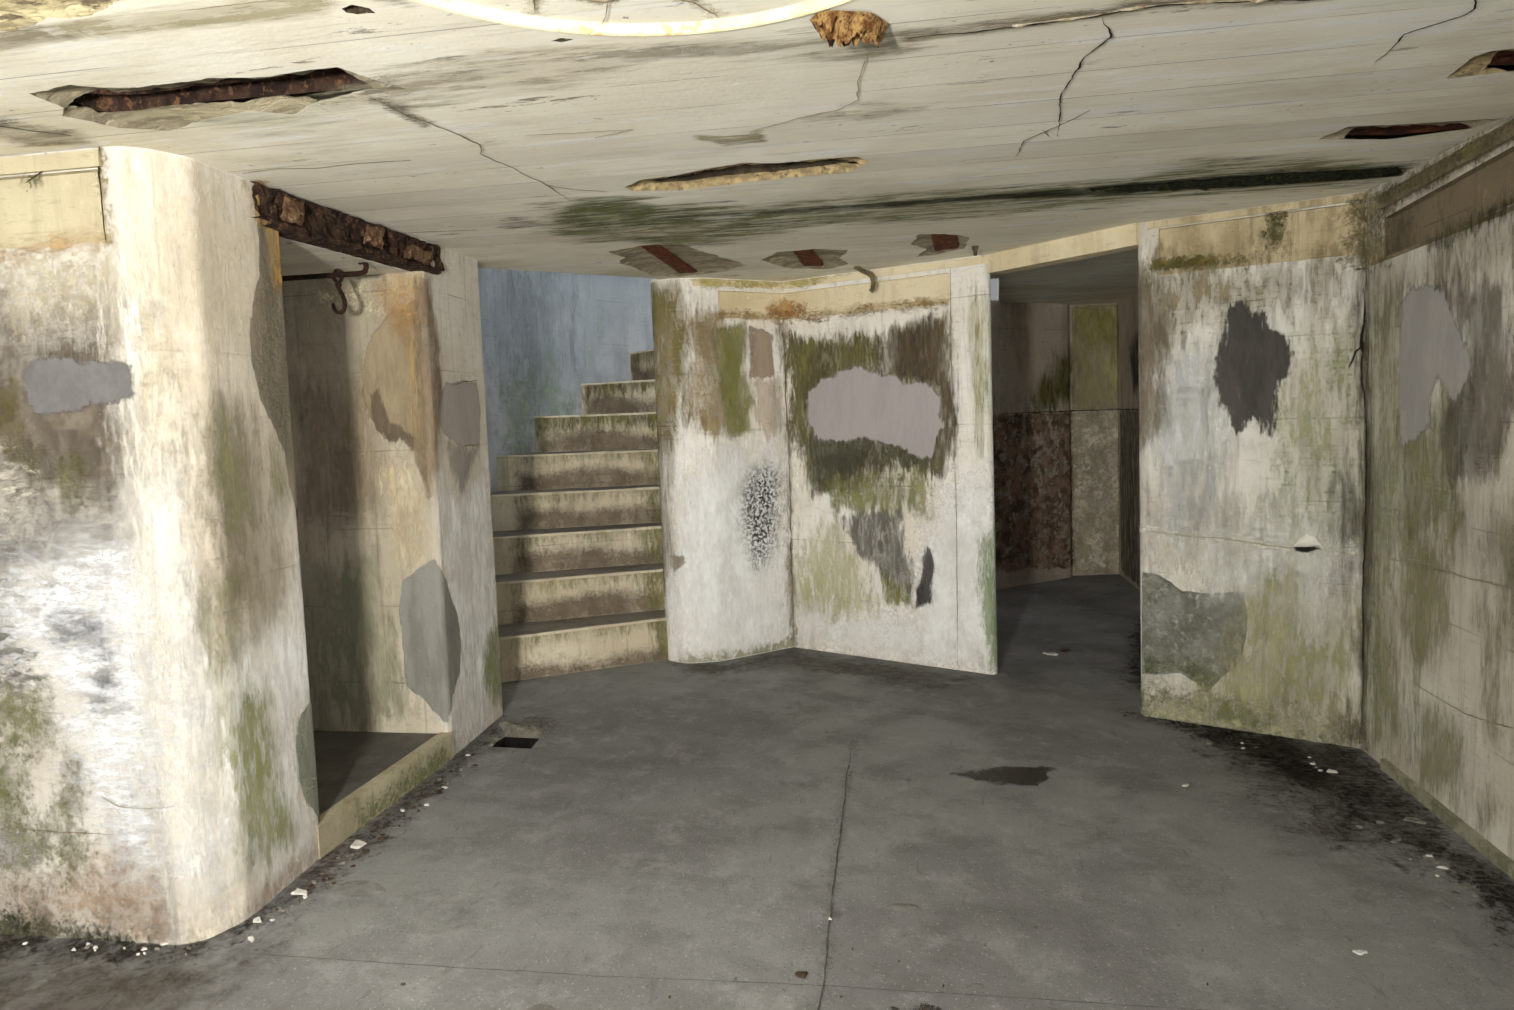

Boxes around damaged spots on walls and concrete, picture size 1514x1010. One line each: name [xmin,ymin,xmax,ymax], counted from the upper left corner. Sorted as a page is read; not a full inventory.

spalling [29,67,404,131]
crack [578,0,618,25]
crack [682,0,718,17]
crack [899,0,1310,156]
crack [1375,0,1477,62]
spalling [625,157,868,191]
rust [252,181,305,290]
leakage [0,290,139,587]
peeling [0,215,320,946]
leakage [0,627,39,693]
leakage [53,611,112,712]
spalling [1141,572,1248,693]